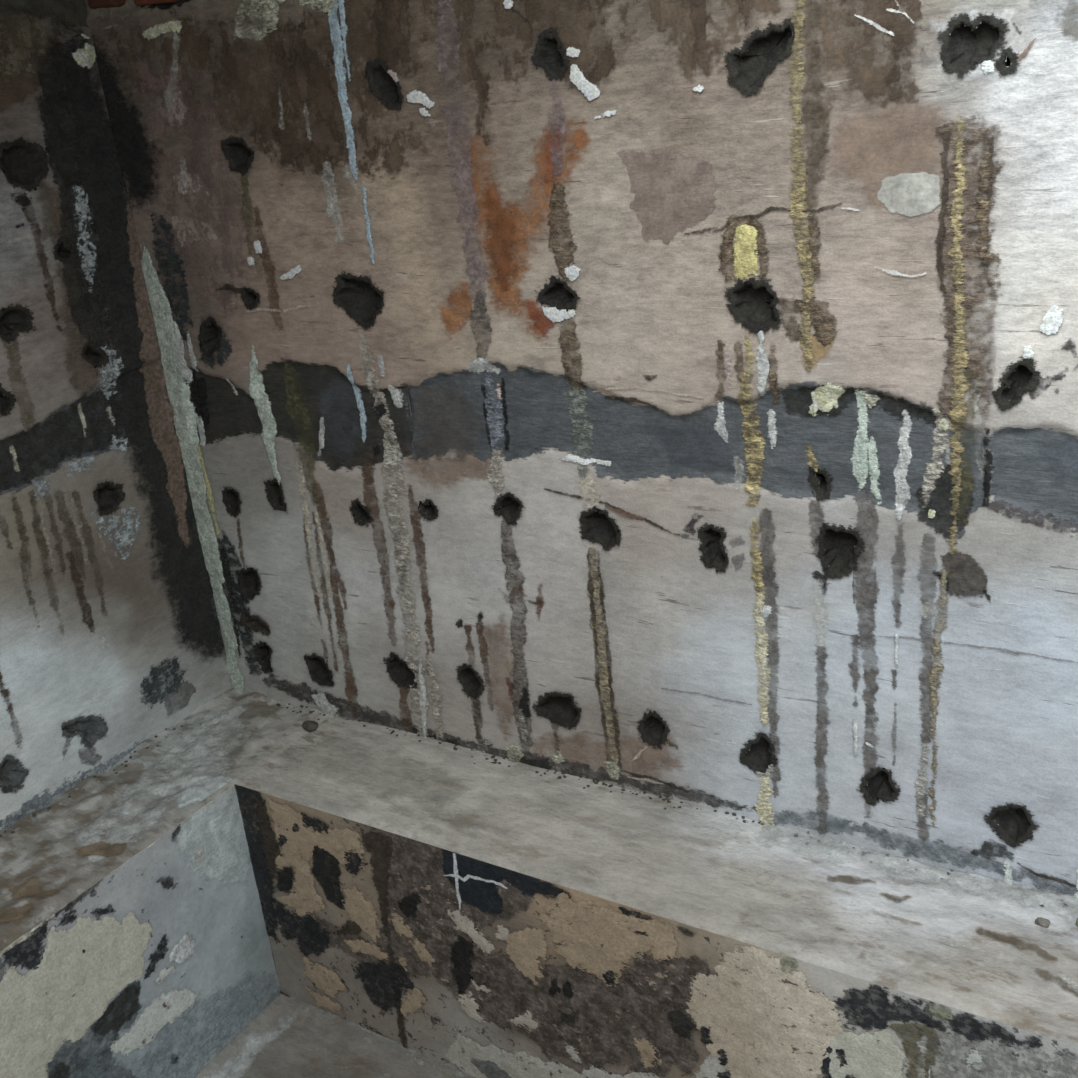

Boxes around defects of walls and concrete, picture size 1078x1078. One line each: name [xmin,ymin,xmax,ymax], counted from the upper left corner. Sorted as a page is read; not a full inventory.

rust [468,121,587,338]
rust [441,283,472,331]
damp [260,0,1078,920]
damp [0,672,18,727]
damp [139,658,196,715]
peeling [266,797,435,971]
peeling [0,912,152,1078]
peeling [110,965,200,1057]
peeling [444,1033,666,1078]
peeling [448,891,694,988]
peeling [686,945,906,1078]
damp [977,928,1078,996]